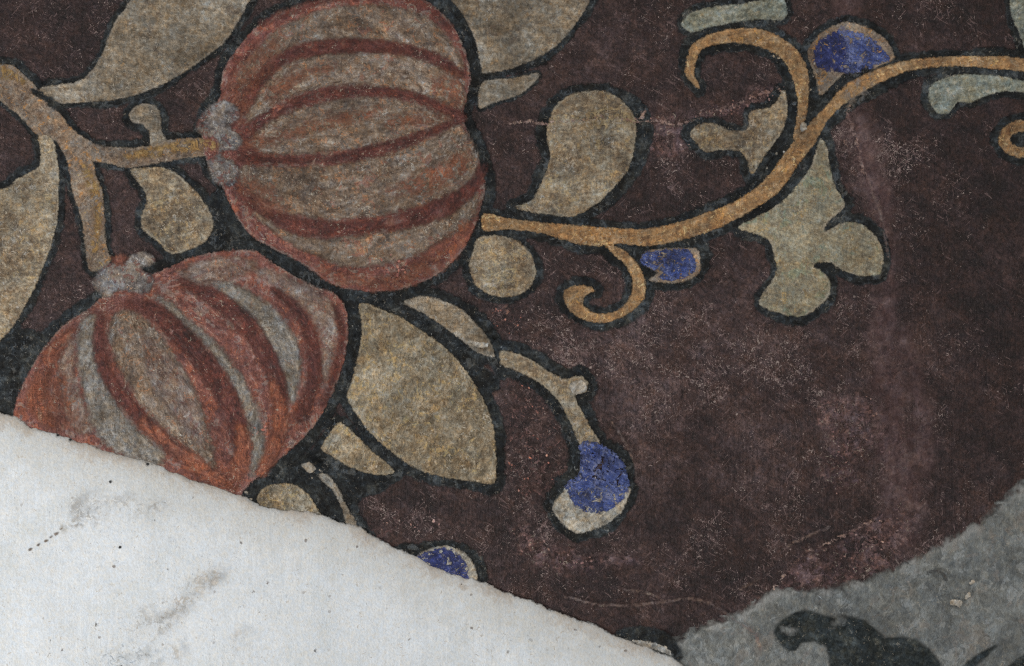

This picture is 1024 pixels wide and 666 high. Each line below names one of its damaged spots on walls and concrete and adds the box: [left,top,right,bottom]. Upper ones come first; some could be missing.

peeling [507,382,563,499]
peeling [510,524,640,574]
peeling [774,503,920,590]